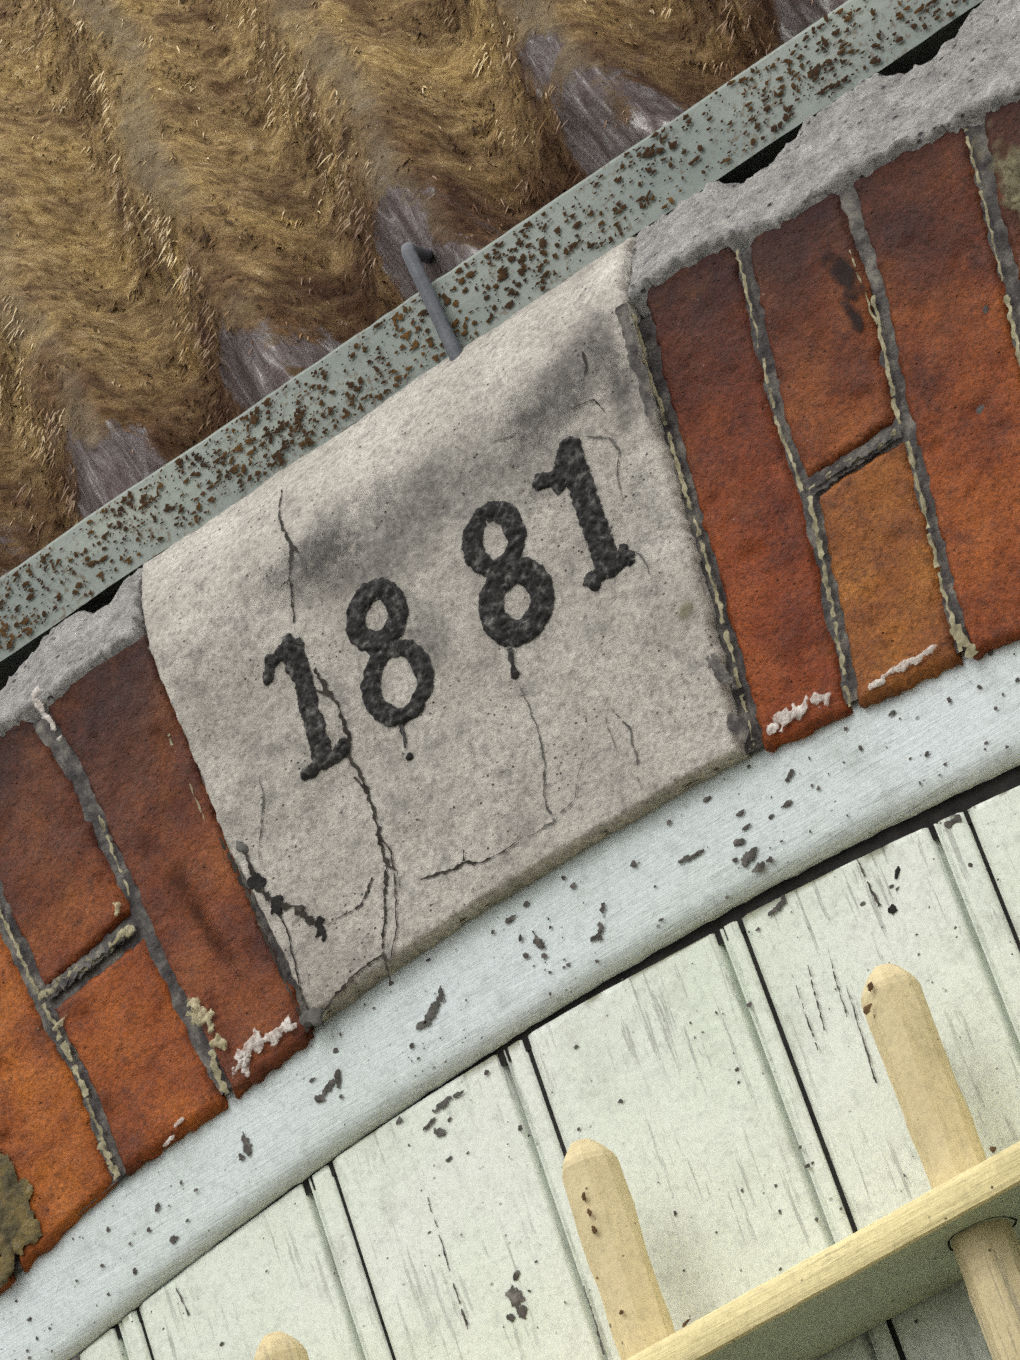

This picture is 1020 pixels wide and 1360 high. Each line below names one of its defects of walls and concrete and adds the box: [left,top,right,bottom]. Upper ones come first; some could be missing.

corrosion [0,0,966,650]
water stain [611,302,657,423]
crack [277,489,299,623]
efflorescence [868,644,937,690]
crack [605,707,641,787]
water stain [726,692,830,750]
crack [219,667,582,1032]
peeling [732,809,773,873]
peeling [518,933,548,959]
peeling [590,905,605,942]
water stain [232,1016,297,1077]
peeling [506,1305,527,1322]